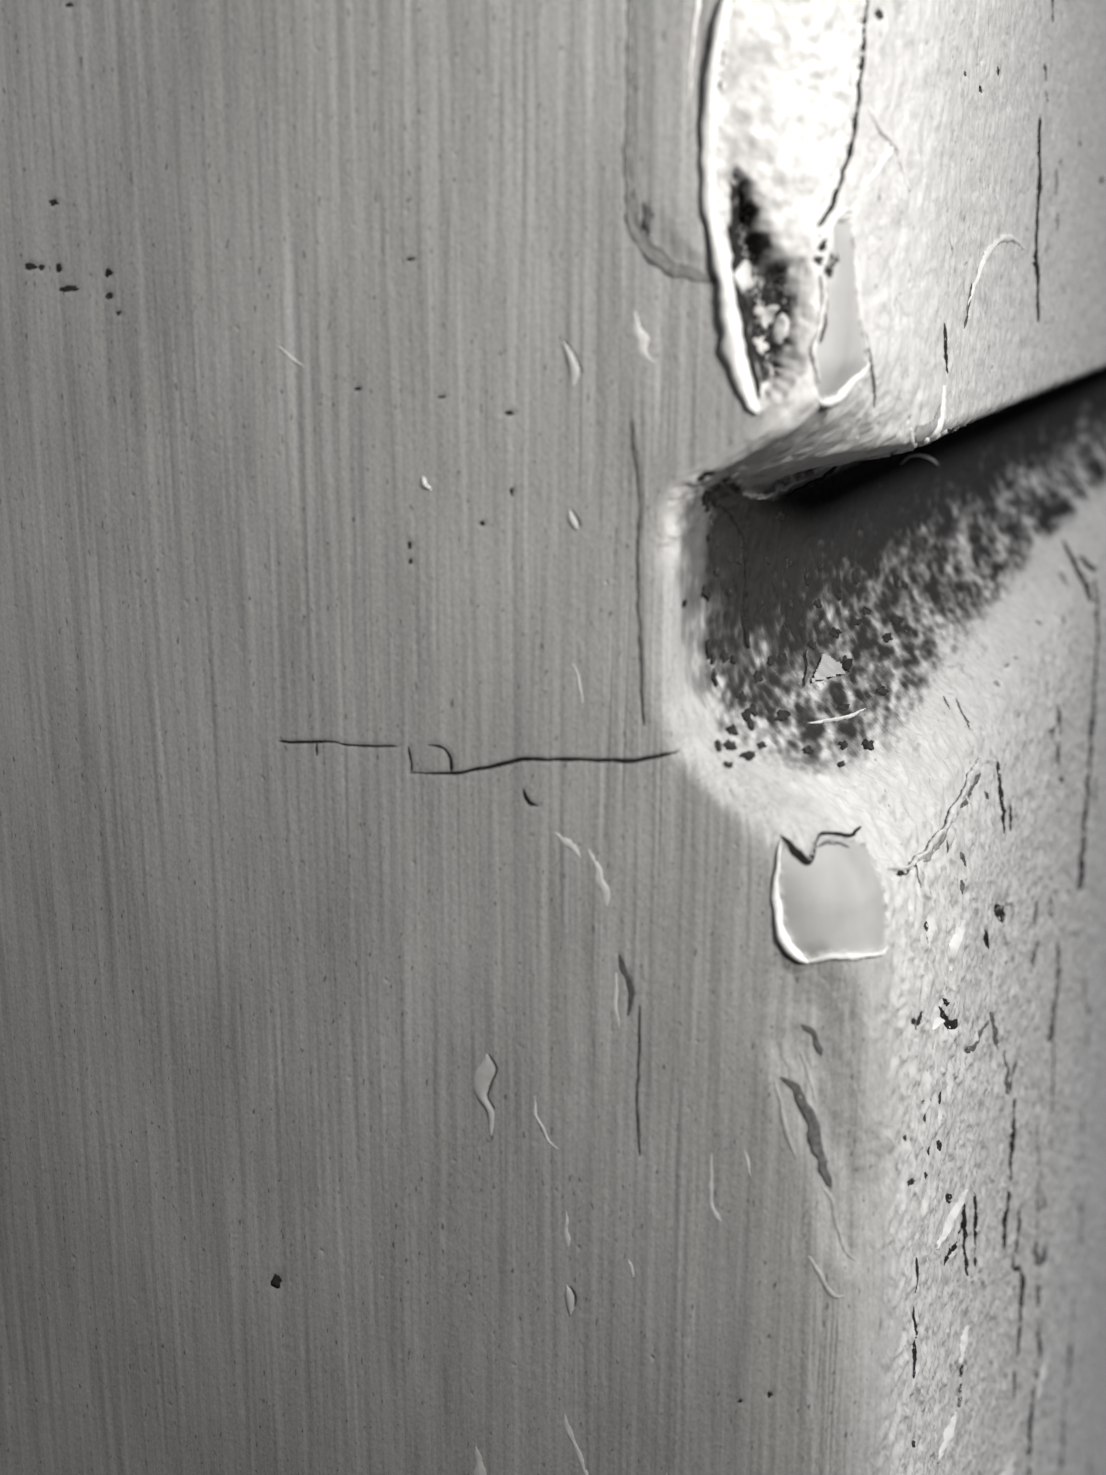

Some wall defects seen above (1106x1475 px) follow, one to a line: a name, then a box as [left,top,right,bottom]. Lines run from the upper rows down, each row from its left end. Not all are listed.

spalling [701,0,884,414]
crack [1032,63,1059,323]
crack [279,422,679,806]
spalling [772,757,997,1262]
crack [912,539,1100,1475]